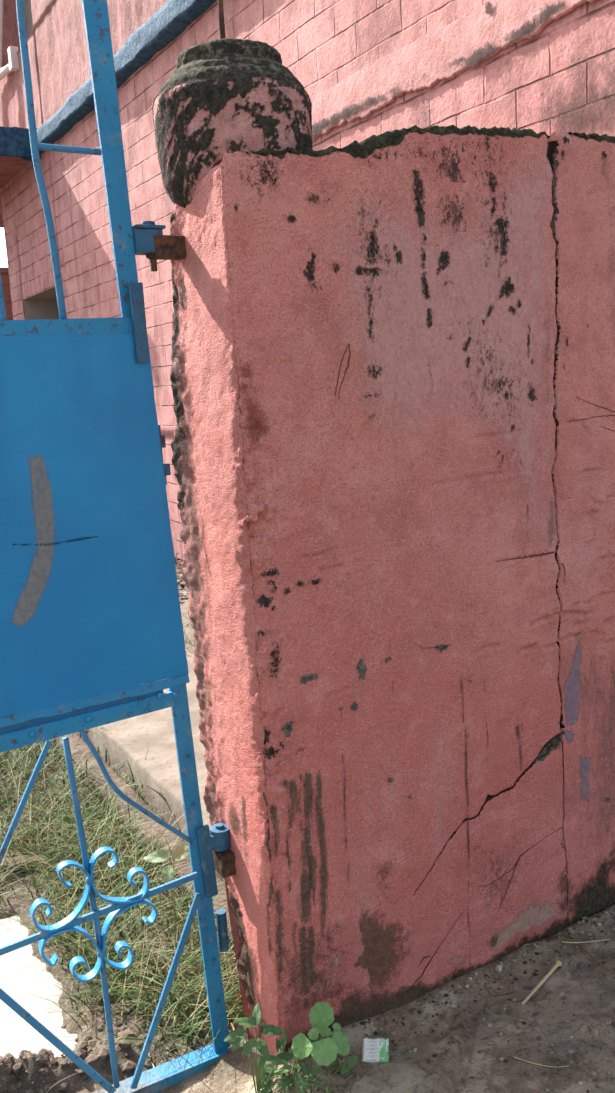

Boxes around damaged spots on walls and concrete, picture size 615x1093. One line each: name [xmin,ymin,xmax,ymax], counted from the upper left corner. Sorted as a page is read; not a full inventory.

water stain [152,38,400,212]
water stain [303,246,323,292]
water stain [348,191,403,343]
water stain [367,135,537,472]
crack [414,140,615,921]
water stain [263,772,615,1038]